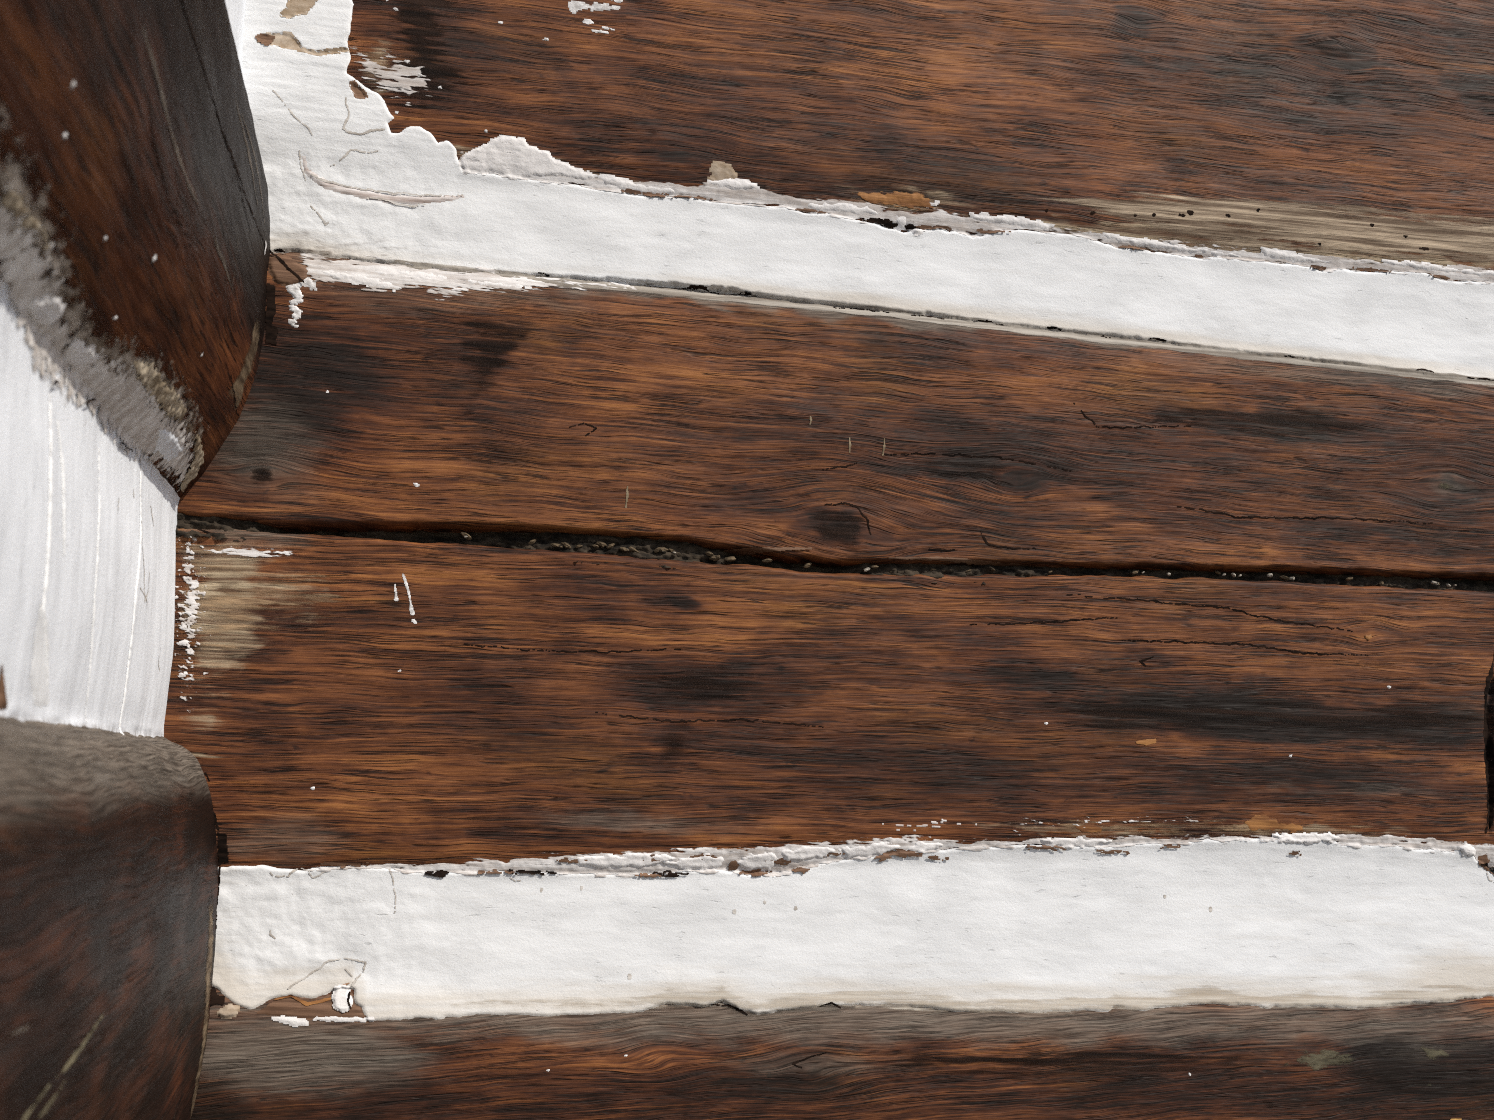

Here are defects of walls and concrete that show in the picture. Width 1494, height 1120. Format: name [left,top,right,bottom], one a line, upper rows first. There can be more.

peeling [255,0,397,72]
peeling [349,80,368,99]
peeling [268,248,656,300]